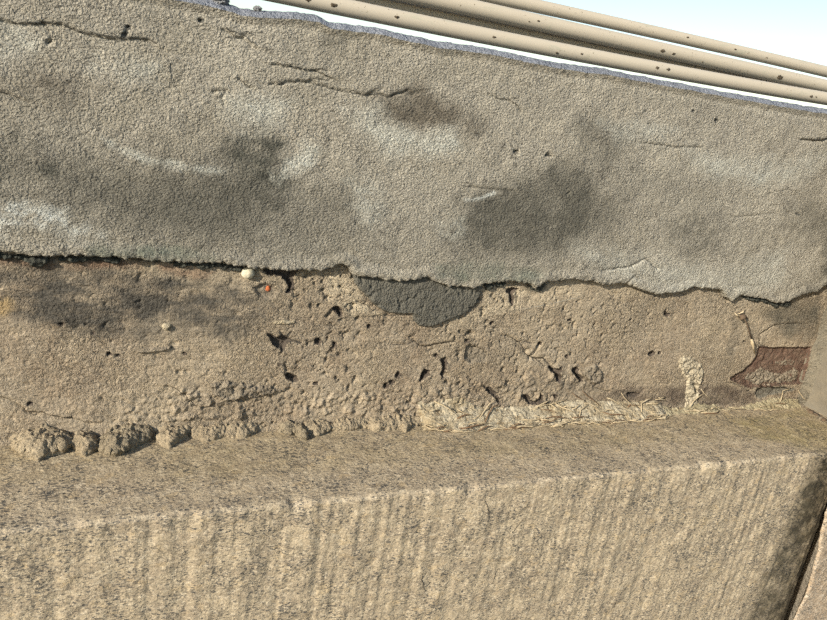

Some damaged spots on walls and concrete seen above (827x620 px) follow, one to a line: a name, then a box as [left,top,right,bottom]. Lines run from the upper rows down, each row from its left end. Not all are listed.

crack [1,17,157,46]
crack [276,64,418,97]
leakage [0,7,827,354]
spalling [252,282,278,300]
spalling [464,344,490,364]
spalling [730,346,811,399]
flaking render [210,380,281,402]